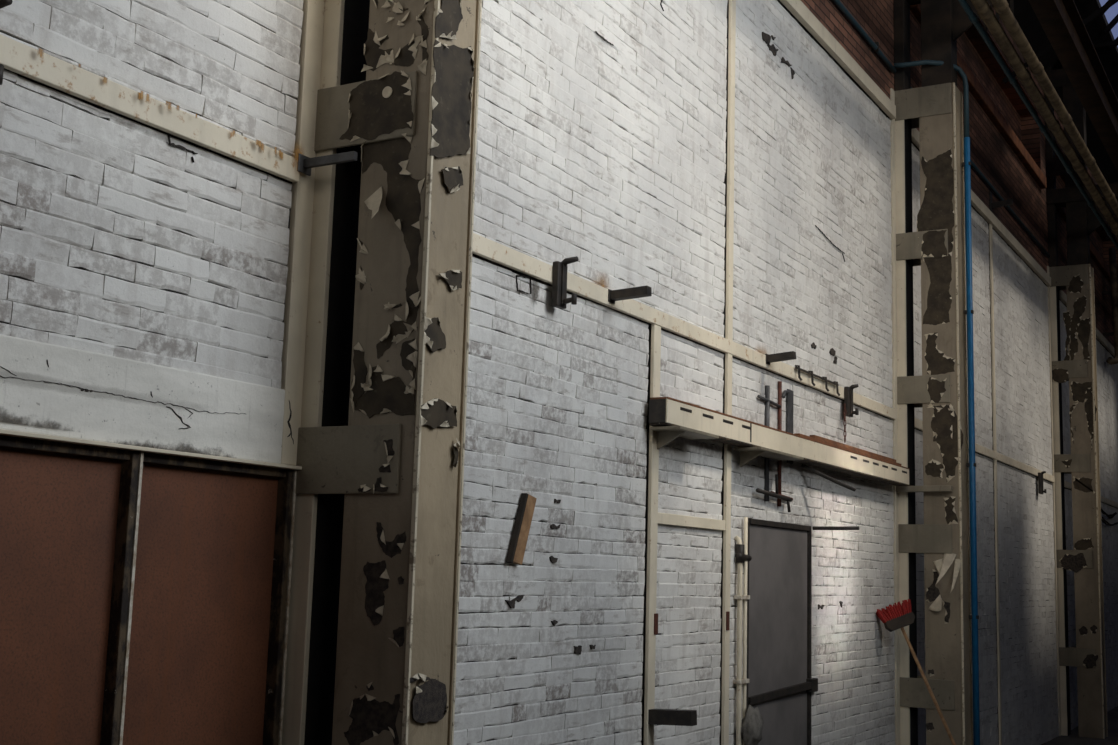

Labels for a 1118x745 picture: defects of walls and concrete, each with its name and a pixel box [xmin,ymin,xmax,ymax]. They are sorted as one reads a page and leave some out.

spalling [762,32,795,79]
rust [256,140,303,165]
peeling [339,0,475,468]
peeling [917,148,963,483]
crack [0,360,245,429]
peeling [1052,274,1097,448]
peeling [944,496,958,525]
peeling [1062,459,1095,493]
peeling [363,522,406,626]
peeling [926,553,961,624]
peeling [1059,538,1094,573]
peeling [344,673,448,745]